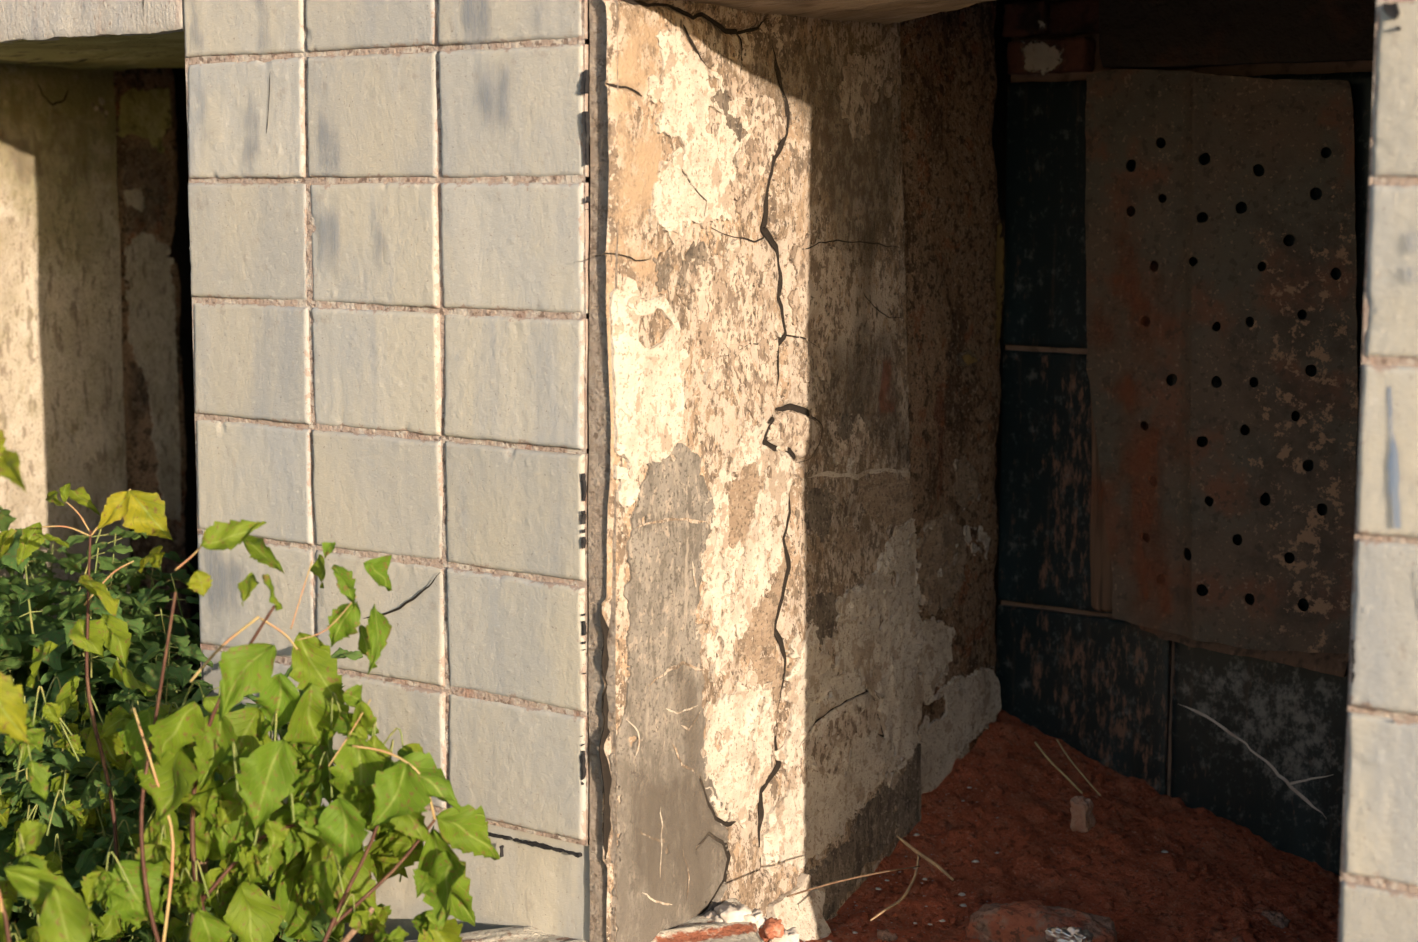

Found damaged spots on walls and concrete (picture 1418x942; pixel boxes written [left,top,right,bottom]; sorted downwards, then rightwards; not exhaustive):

peeling [118,87,172,153]
crack [606,83,642,96]
peeling [123,188,146,212]
peeling [124,232,181,522]
crack [622,0,900,915]
peeling [609,27,1002,941]
crack [364,575,438,619]